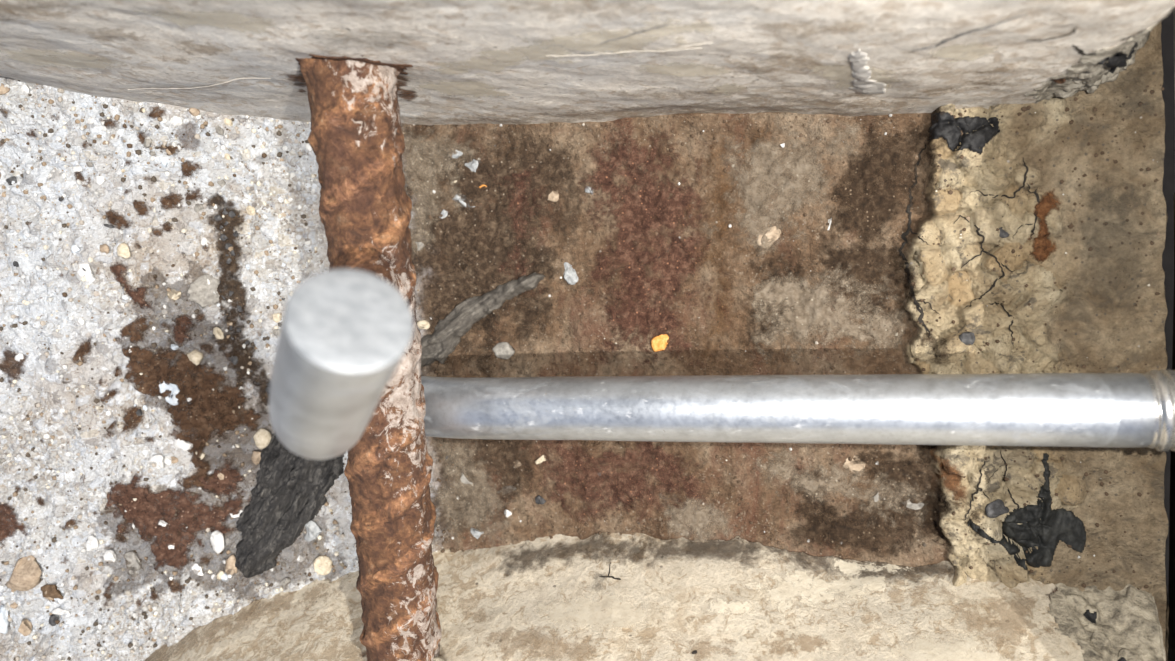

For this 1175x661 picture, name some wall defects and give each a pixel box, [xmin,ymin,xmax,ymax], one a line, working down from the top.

rust [287,54,417,101]
spalling [1024,16,1166,104]
spalling [439,180,475,219]
crack [899,139,1040,346]
rust [1028,191,1061,262]
spalling [651,333,669,352]
rust [93,262,263,607]
rust [0,504,27,546]
spalling [843,455,866,476]
spalling [902,499,924,510]
crack [963,450,1019,521]